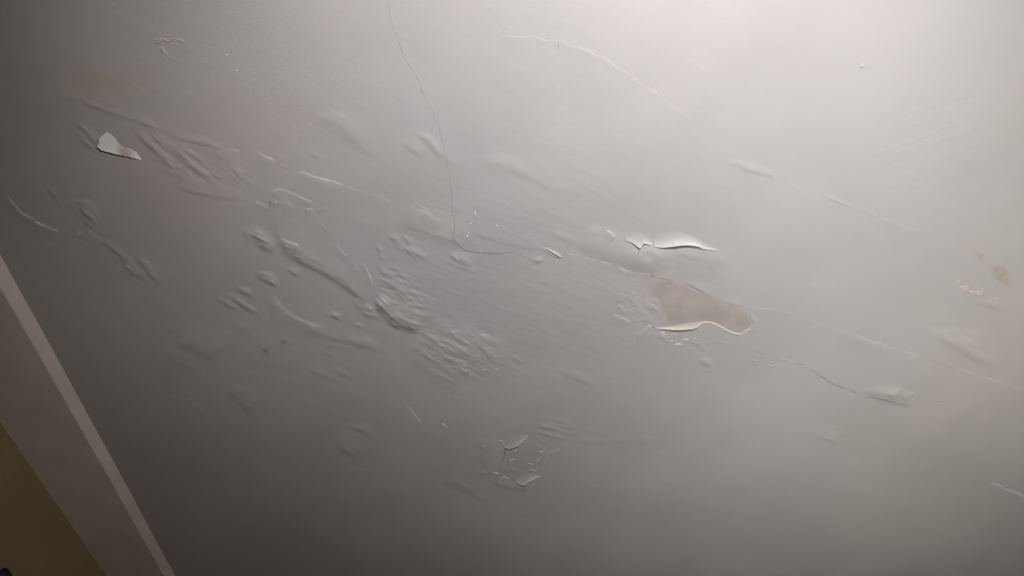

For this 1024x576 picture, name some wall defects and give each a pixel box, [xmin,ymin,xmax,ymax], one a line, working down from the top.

peeling [95,132,141,161]
crack [384,0,536,261]
peeling [600,230,719,260]
peeling [636,268,760,344]